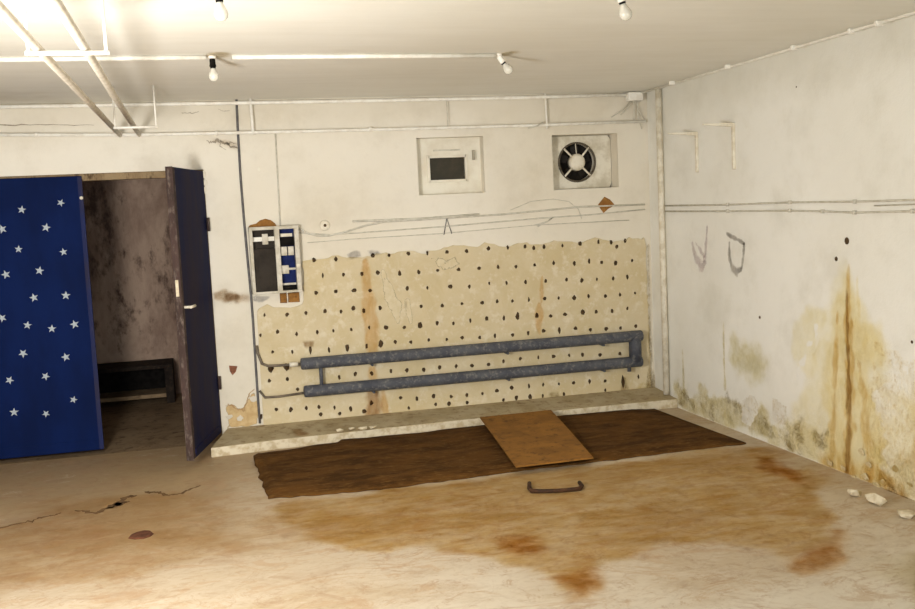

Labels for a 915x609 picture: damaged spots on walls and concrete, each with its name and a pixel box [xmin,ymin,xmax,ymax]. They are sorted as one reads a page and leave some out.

damp [782,277,838,404]
peeling [226,389,262,427]
damp [740,395,759,431]
flaking render [861,341,915,500]